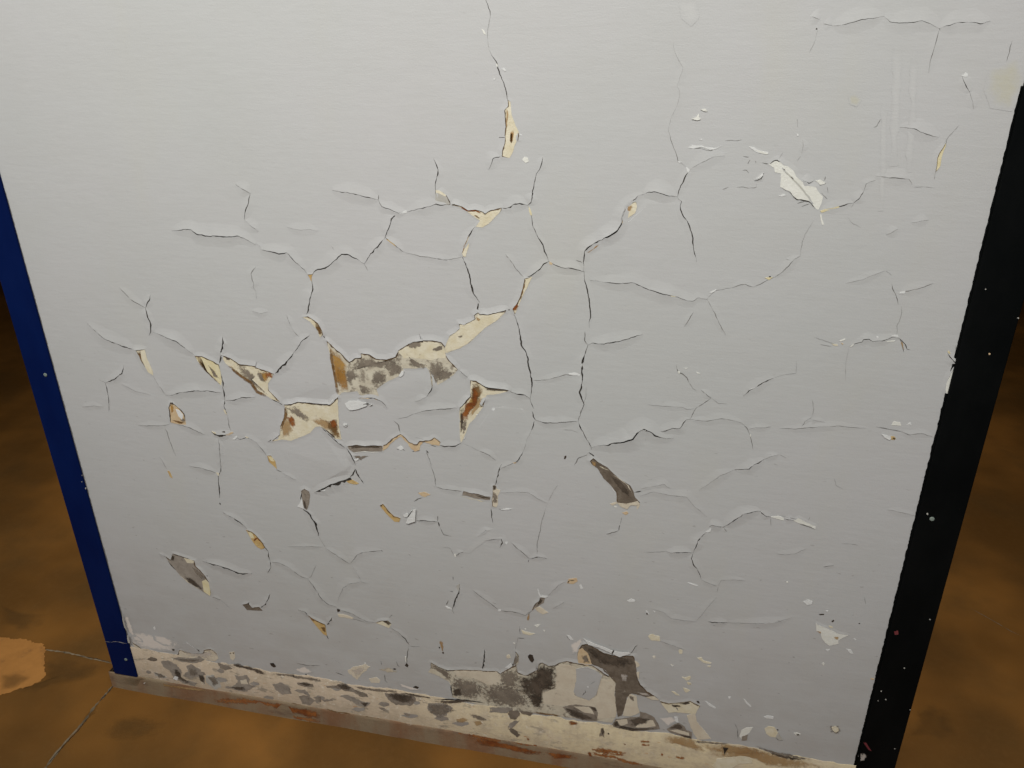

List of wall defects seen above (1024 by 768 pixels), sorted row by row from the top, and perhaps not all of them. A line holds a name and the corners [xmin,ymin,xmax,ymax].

crack [482,4,510,100]
crack [810,5,991,73]
peeling [744,147,839,225]
crack [467,42,940,579]
crack [82,158,481,608]
peeling [193,275,533,524]
crack [944,347,956,366]
peeling [586,453,642,515]
peeling [159,551,224,603]
peeling [122,614,259,692]
spalling [264,578,716,740]
damp [529,666,559,716]